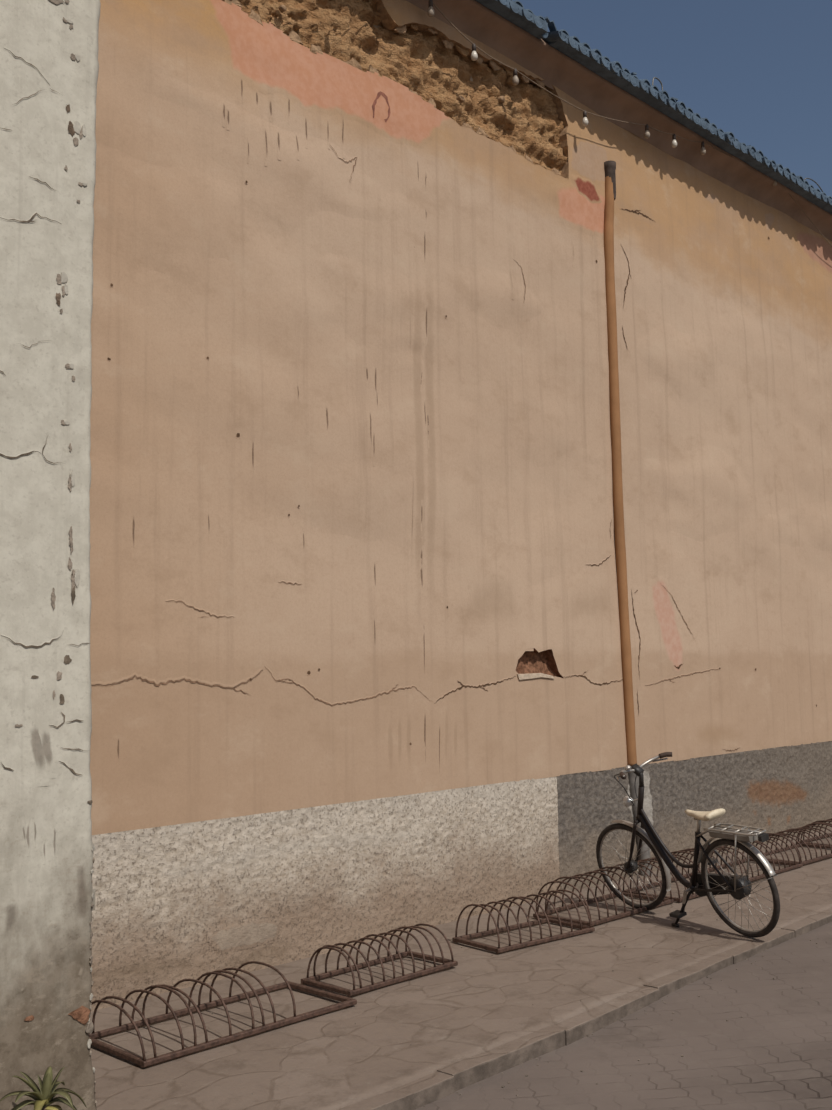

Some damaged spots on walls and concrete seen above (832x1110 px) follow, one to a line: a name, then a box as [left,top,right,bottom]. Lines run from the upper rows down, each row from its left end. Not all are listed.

flaking render [66,104,86,146]
flaking render [204,0,609,239]
flaking render [56,272,68,313]
crack [0,436,61,464]
flaking render [68,526,80,603]
crack [165,599,235,618]
crack [1,630,89,648]
flaking render [53,655,72,704]
crack [91,665,516,706]
spalling [516,648,563,680]
crack [53,712,84,775]